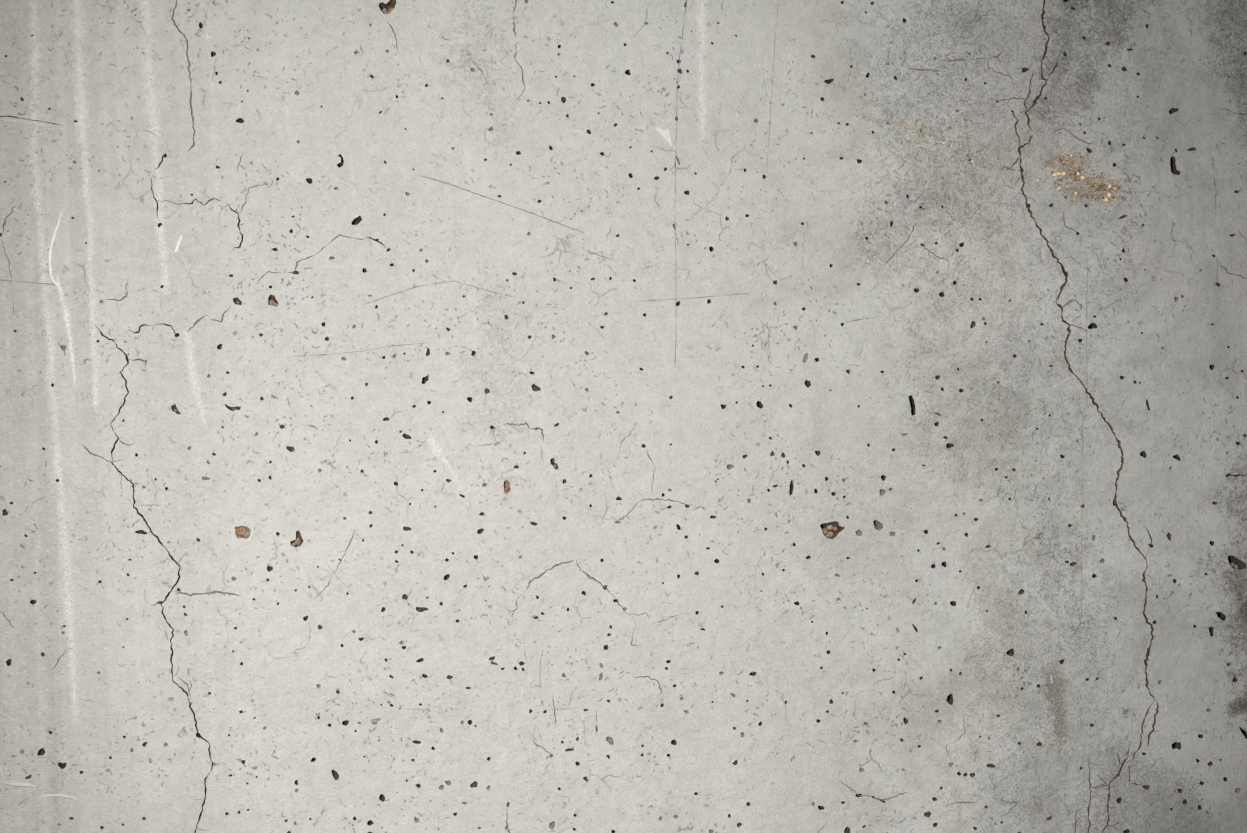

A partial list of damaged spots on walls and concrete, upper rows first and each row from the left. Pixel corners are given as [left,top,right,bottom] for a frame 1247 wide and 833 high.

crack [82,280,241,833]
crack [904,0,1160,833]
rust [1037,145,1131,210]